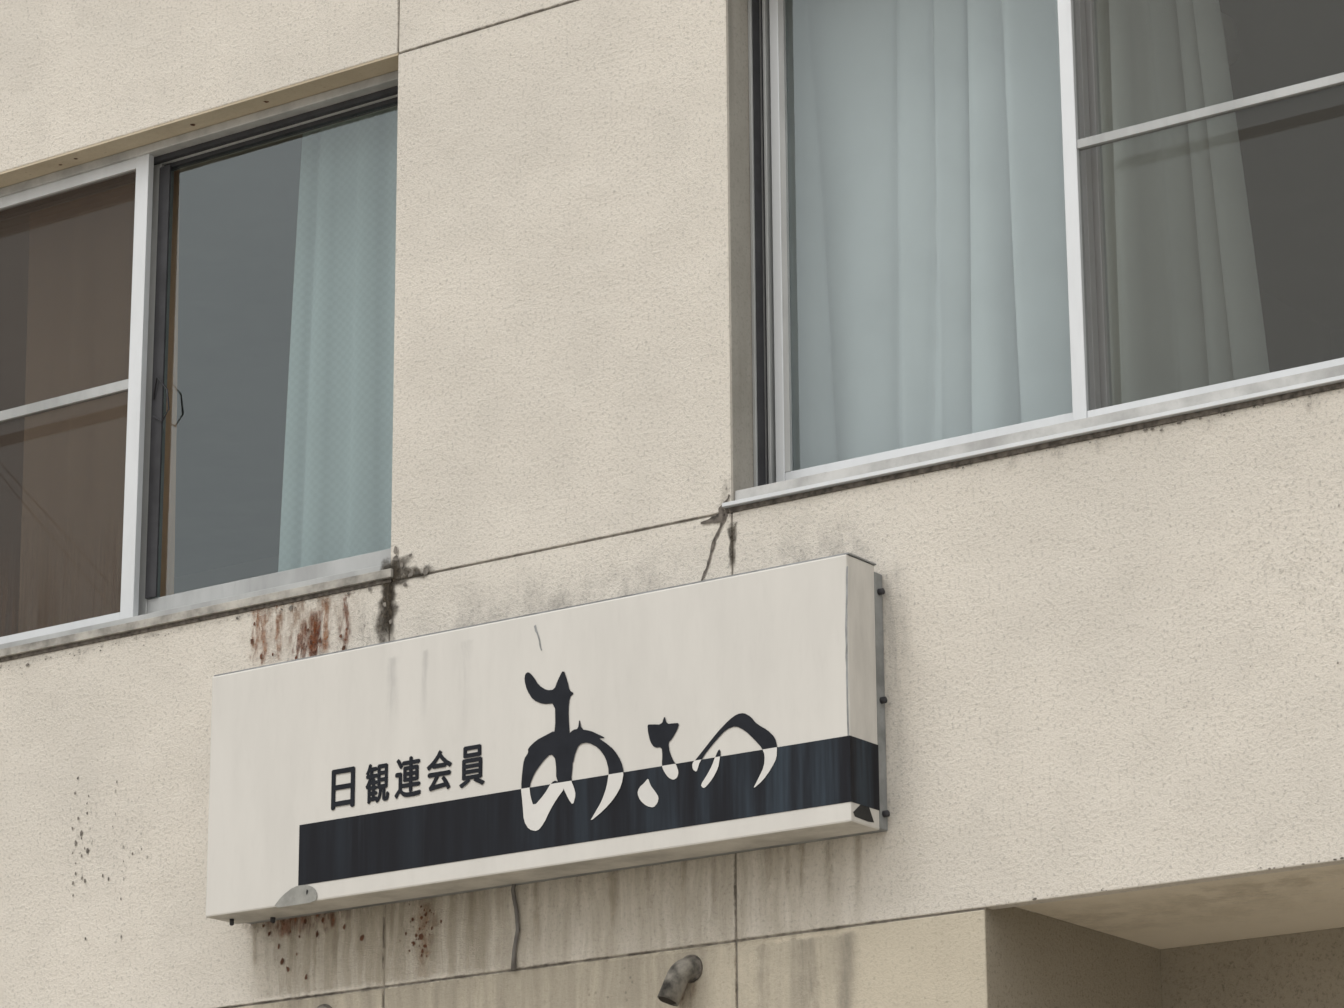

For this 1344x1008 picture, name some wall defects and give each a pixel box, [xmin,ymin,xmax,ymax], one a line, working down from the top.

crack [701,494,730,581]
damp [368,546,429,641]
corrosion [251,598,350,663]
corrosion [251,913,345,972]
corrosion [399,904,442,957]